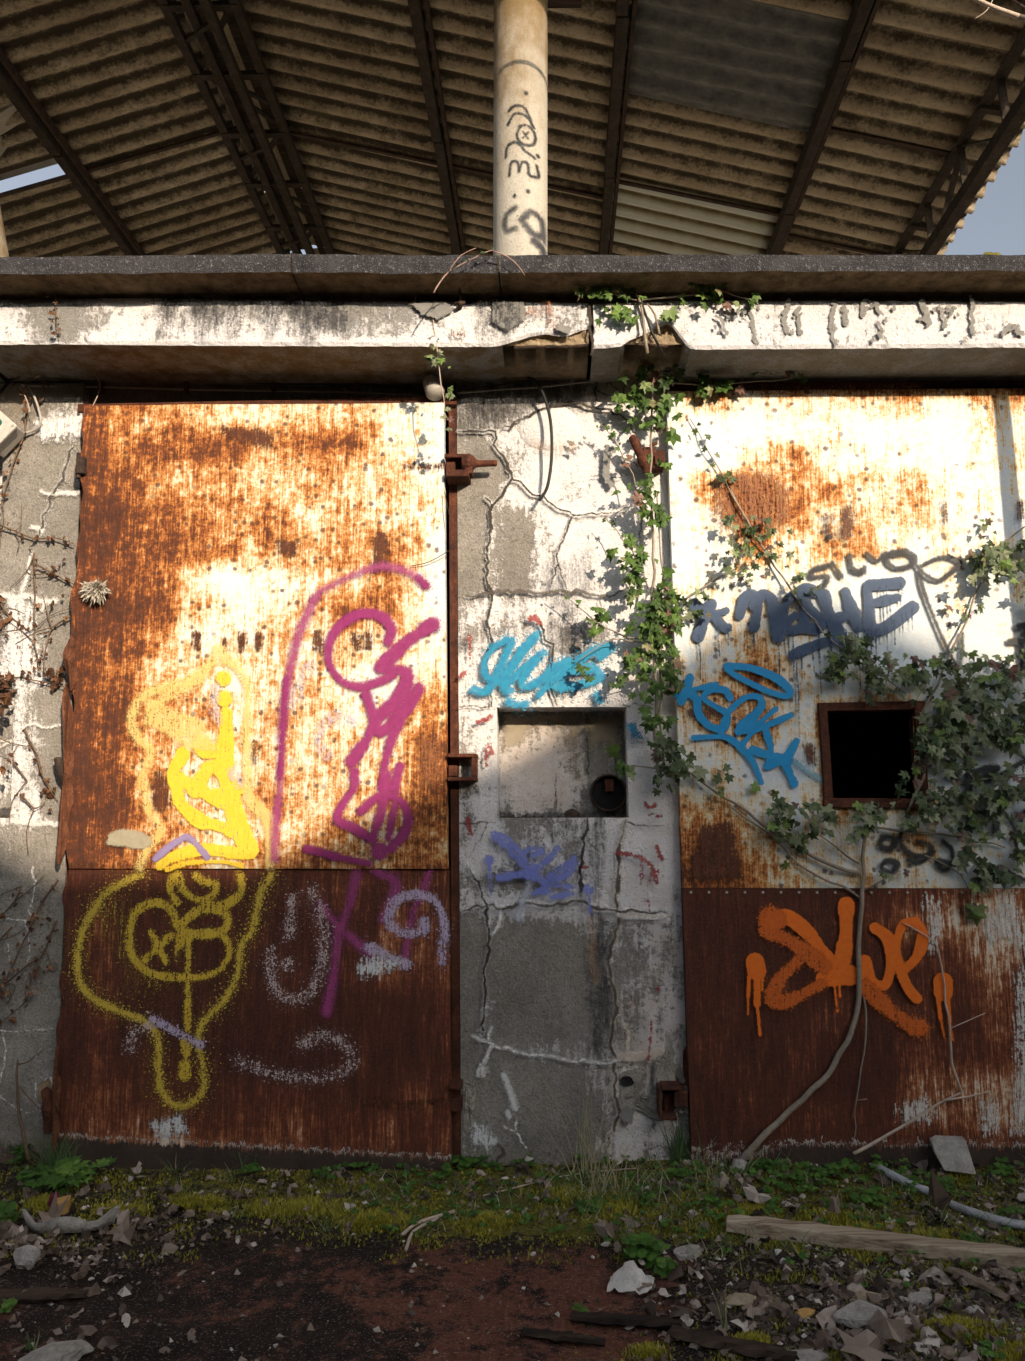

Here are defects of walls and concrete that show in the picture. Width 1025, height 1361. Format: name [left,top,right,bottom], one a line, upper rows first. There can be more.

rust [221,425,278,449]
rust [403,463,446,471]
rust [369,528,390,573]
crack [458,301,651,775]
rust [222,630,264,652]
rust [352,632,373,651]
rust [150,770,171,814]
crack [10,818,60,827]
crack [0,866,37,962]
crack [459,818,668,1151]
crack [0,1028,52,1114]
crack [496,1119,527,1163]